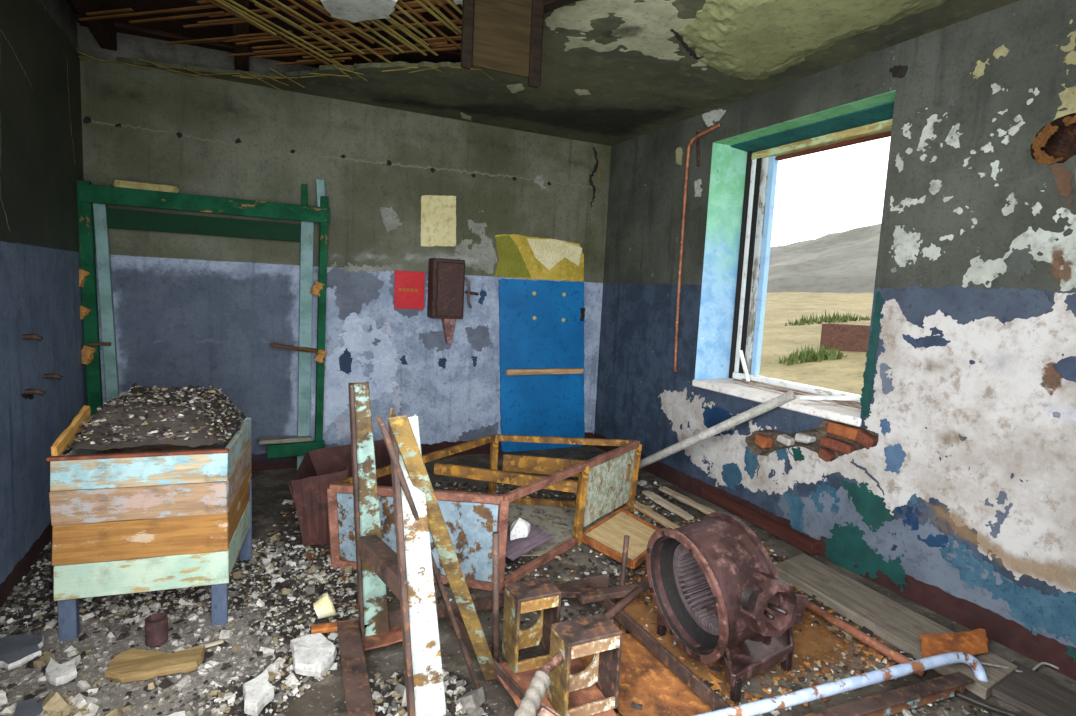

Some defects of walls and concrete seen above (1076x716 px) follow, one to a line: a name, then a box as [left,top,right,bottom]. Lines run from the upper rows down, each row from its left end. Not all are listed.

peeling [970,45,1010,94]
crack [66,57,601,208]
spalling [702,108,726,127]
peeling [895,87,1040,187]
spalling [1030,19,1076,181]
peeling [379,207,402,232]
peeling [453,219,498,274]
peeling [311,261,428,448]
peeling [419,330,452,369]
peeling [465,325,493,367]
peeling [456,422,499,442]
peeling [658,179,1076,662]